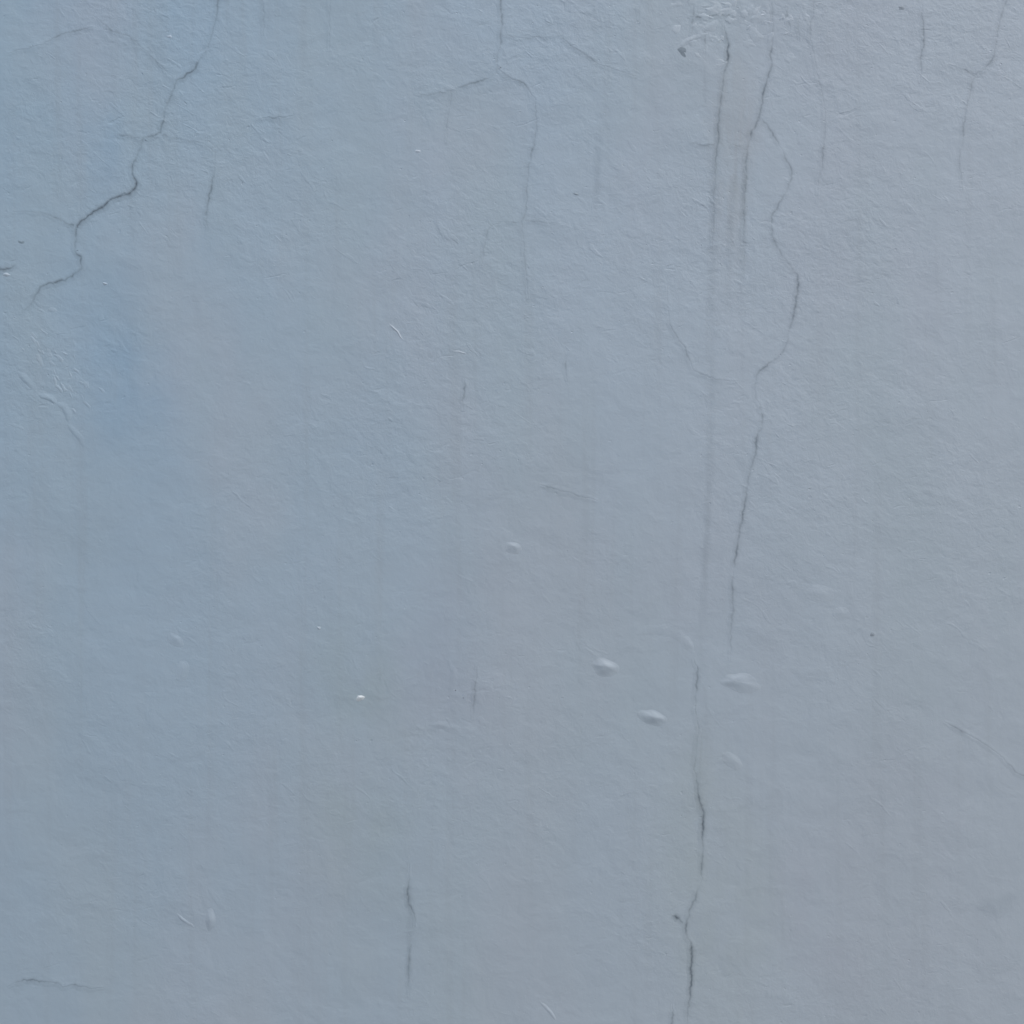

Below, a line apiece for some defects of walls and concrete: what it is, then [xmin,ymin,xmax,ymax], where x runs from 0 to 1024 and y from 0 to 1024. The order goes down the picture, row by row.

crack [12,0,222,317]
crack [685,0,803,661]
crack [403,864,418,1000]
crack [667,657,709,1024]